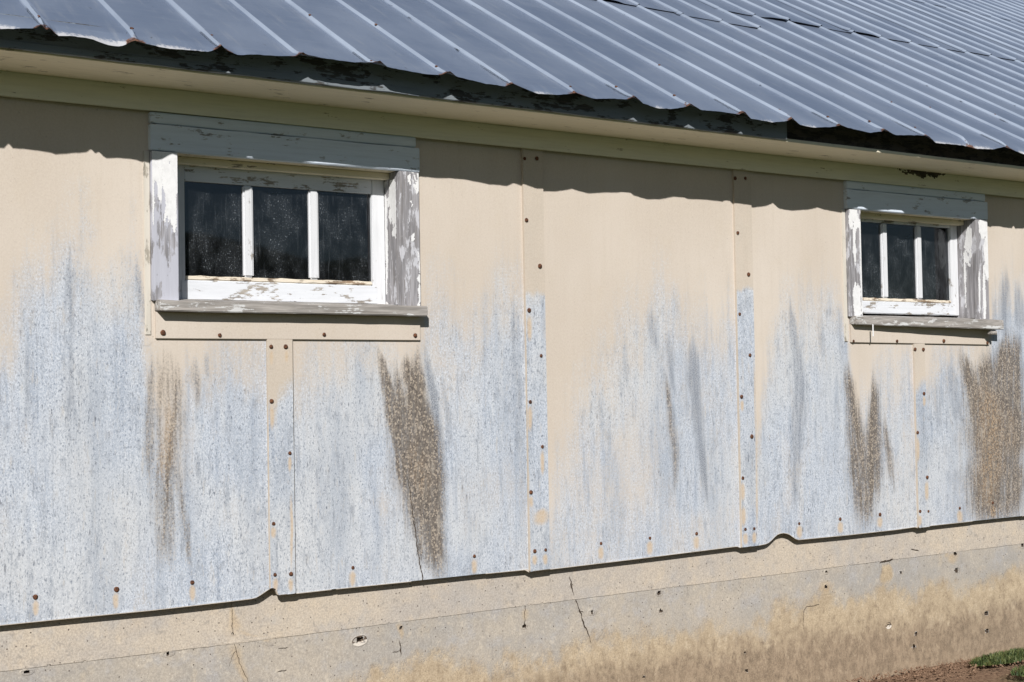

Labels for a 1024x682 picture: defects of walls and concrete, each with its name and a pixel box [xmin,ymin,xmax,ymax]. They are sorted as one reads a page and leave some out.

water stain [57,238,84,440]
water stain [129,244,214,587]
water stain [374,334,457,581]
peeling [0,151,1024,625]
water stain [783,284,900,534]
water stain [928,255,1024,523]
crack [569,577,591,642]